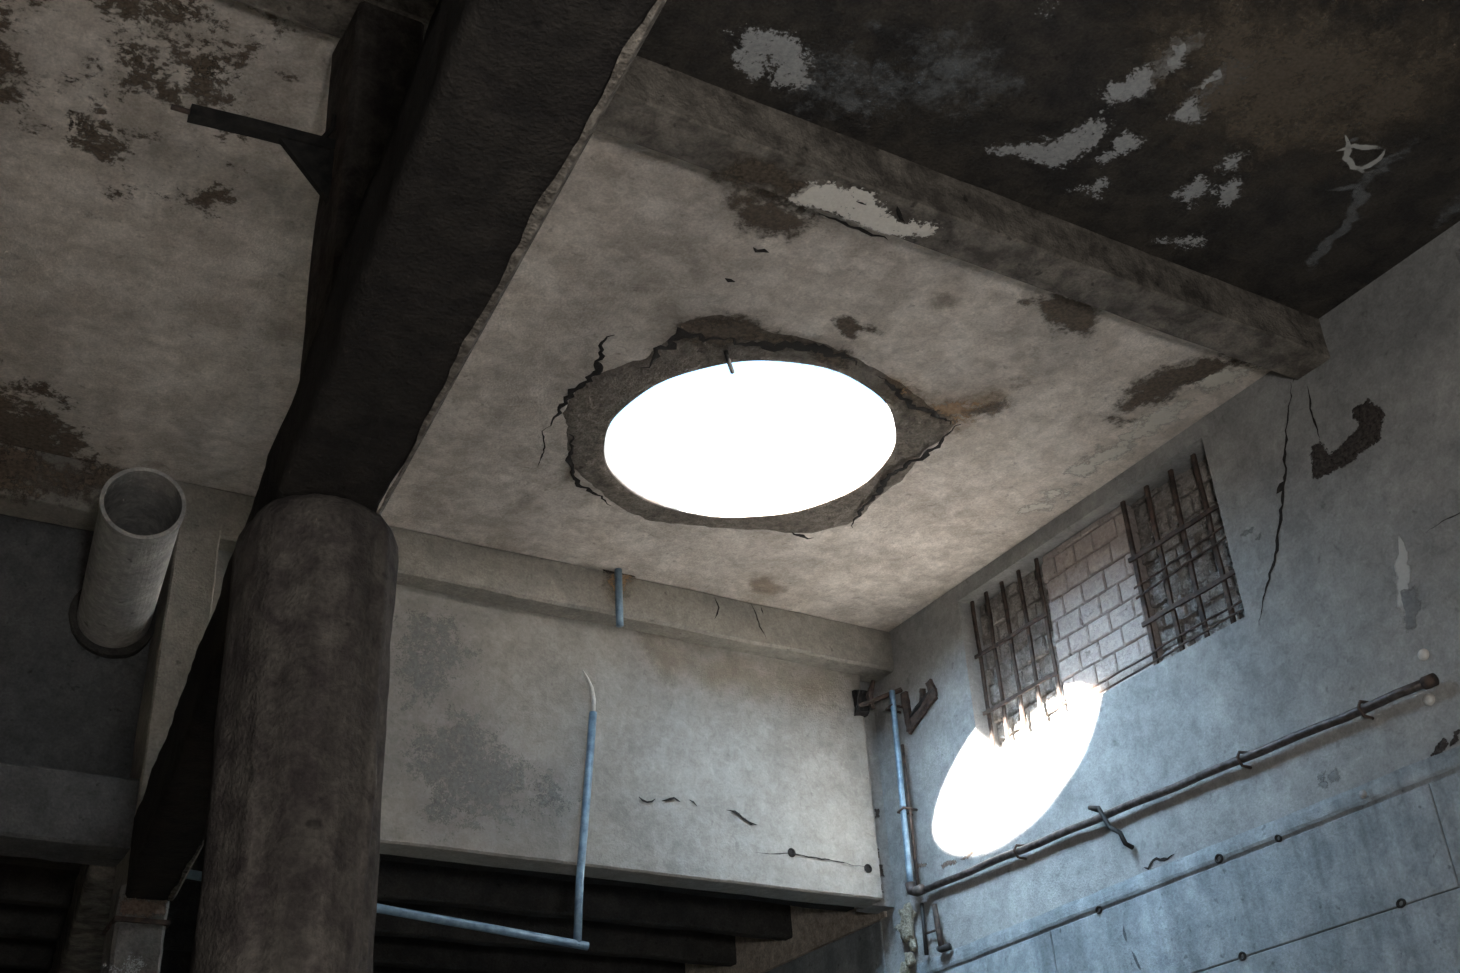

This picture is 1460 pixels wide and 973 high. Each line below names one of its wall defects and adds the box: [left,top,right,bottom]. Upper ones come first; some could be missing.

peeling [0,0,295,219]
peeling [985,31,1205,199]
peeling [1166,66,1225,125]
flaking render [786,180,939,240]
peeling [1151,235,1207,249]
peeling [1171,147,1244,210]
peeling [0,378,100,461]
crack [538,335,614,506]
crack [642,327,961,528]
spalling [1310,398,1386,479]
crack [1259,379,1320,620]